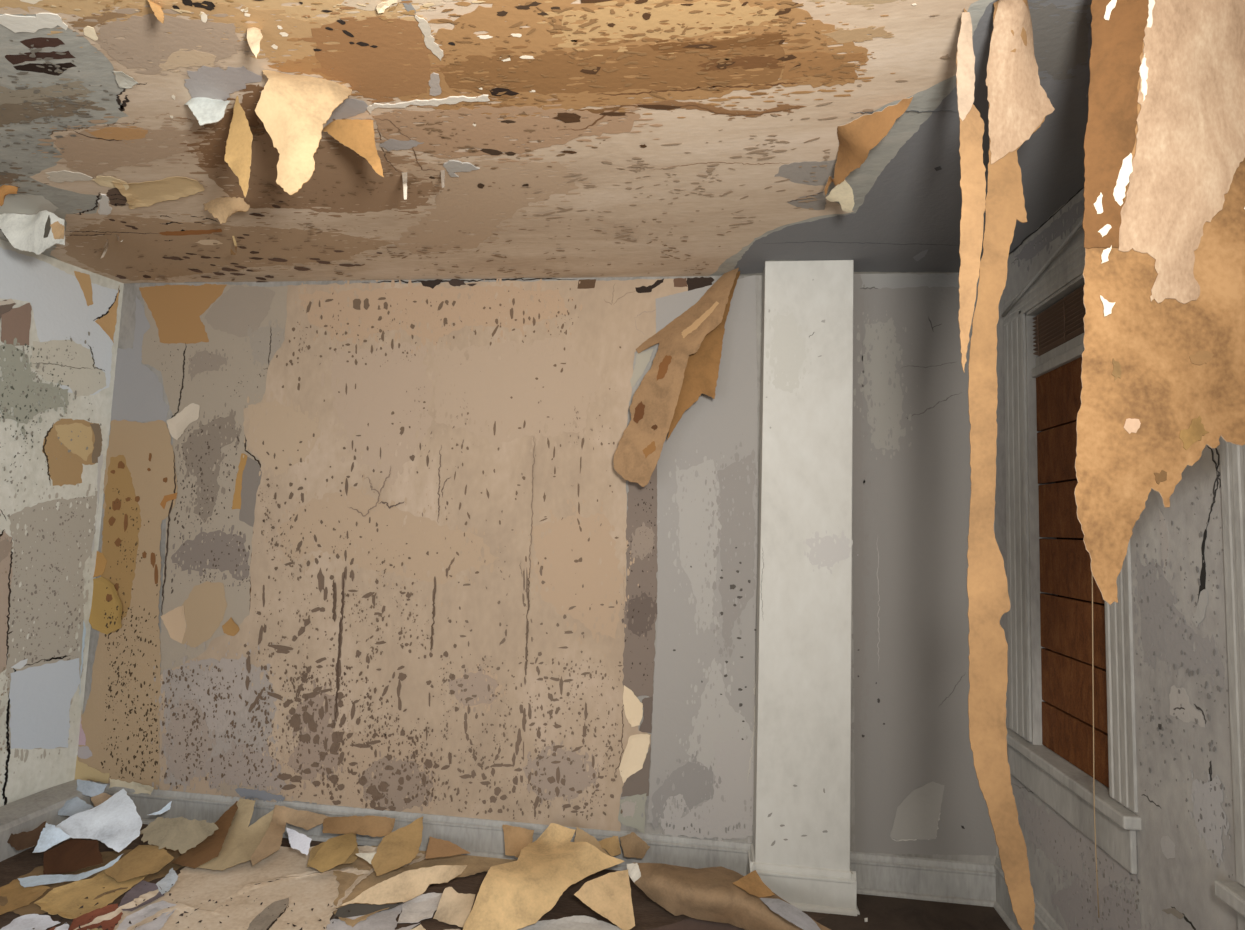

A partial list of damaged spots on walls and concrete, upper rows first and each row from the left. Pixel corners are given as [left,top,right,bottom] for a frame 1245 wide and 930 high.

crack [402,0,416,13]
peeling [46,170,205,215]
flaking render [324,98,368,127]
flaking render [972,0,998,261]
flaking render [1008,0,1092,257]
flaking render [0,230,200,440]
crack [348,468,404,517]
crack [437,446,451,521]
water stain [0,0,918,844]
flaking render [613,85,996,856]
crack [1198,445,1221,600]
flaking render [9,551,122,759]